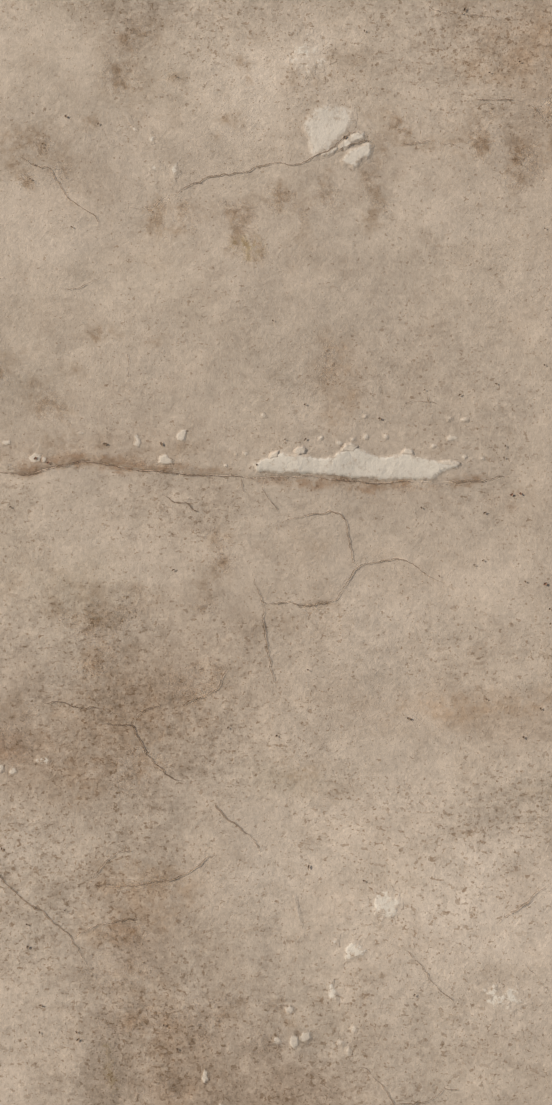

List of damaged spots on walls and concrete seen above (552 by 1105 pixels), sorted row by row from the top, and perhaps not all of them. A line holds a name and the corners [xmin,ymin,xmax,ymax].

crack [30,163,98,221]
crack [183,132,368,189]
flaking render [300,99,375,170]
flaking render [222,415,486,484]
crack [452,475,504,483]
crack [1,461,430,679]
crack [48,701,176,780]
crack [215,804,258,846]
crack [0,876,136,956]